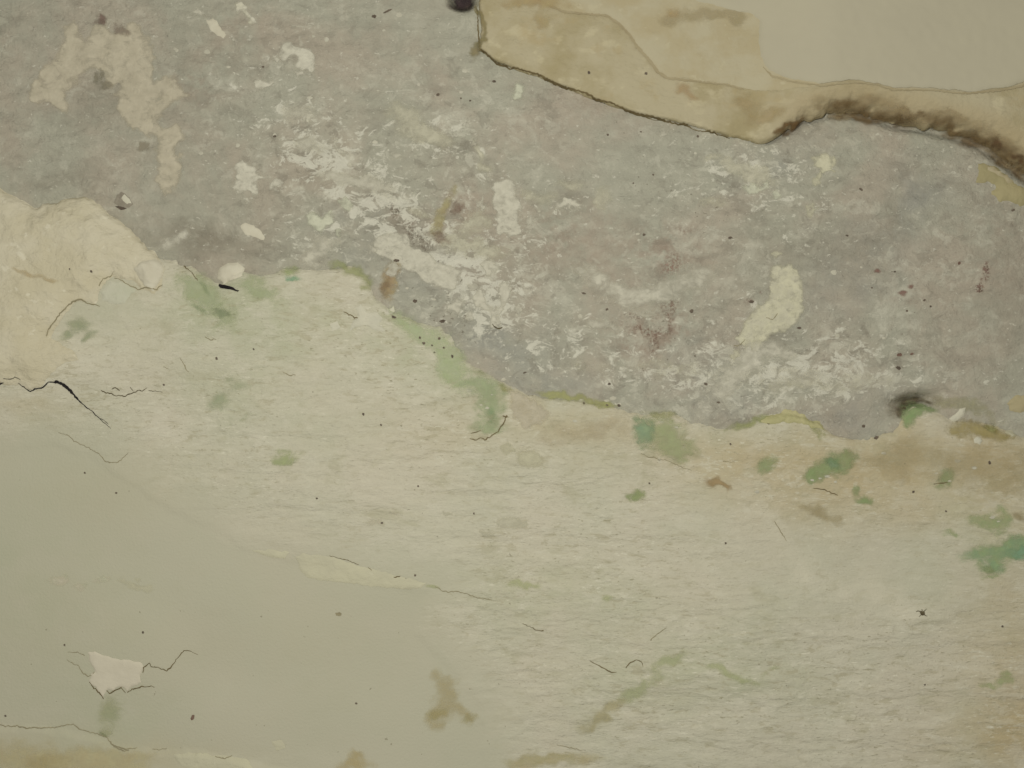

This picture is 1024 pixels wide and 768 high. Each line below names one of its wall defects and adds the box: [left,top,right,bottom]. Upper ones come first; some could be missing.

leakage [740,99,803,136]
leakage [832,95,1024,179]
spalling [0,0,1024,445]
crack [0,360,189,429]
crack [472,415,508,441]
peeling [69,650,198,699]
crack [0,724,167,752]